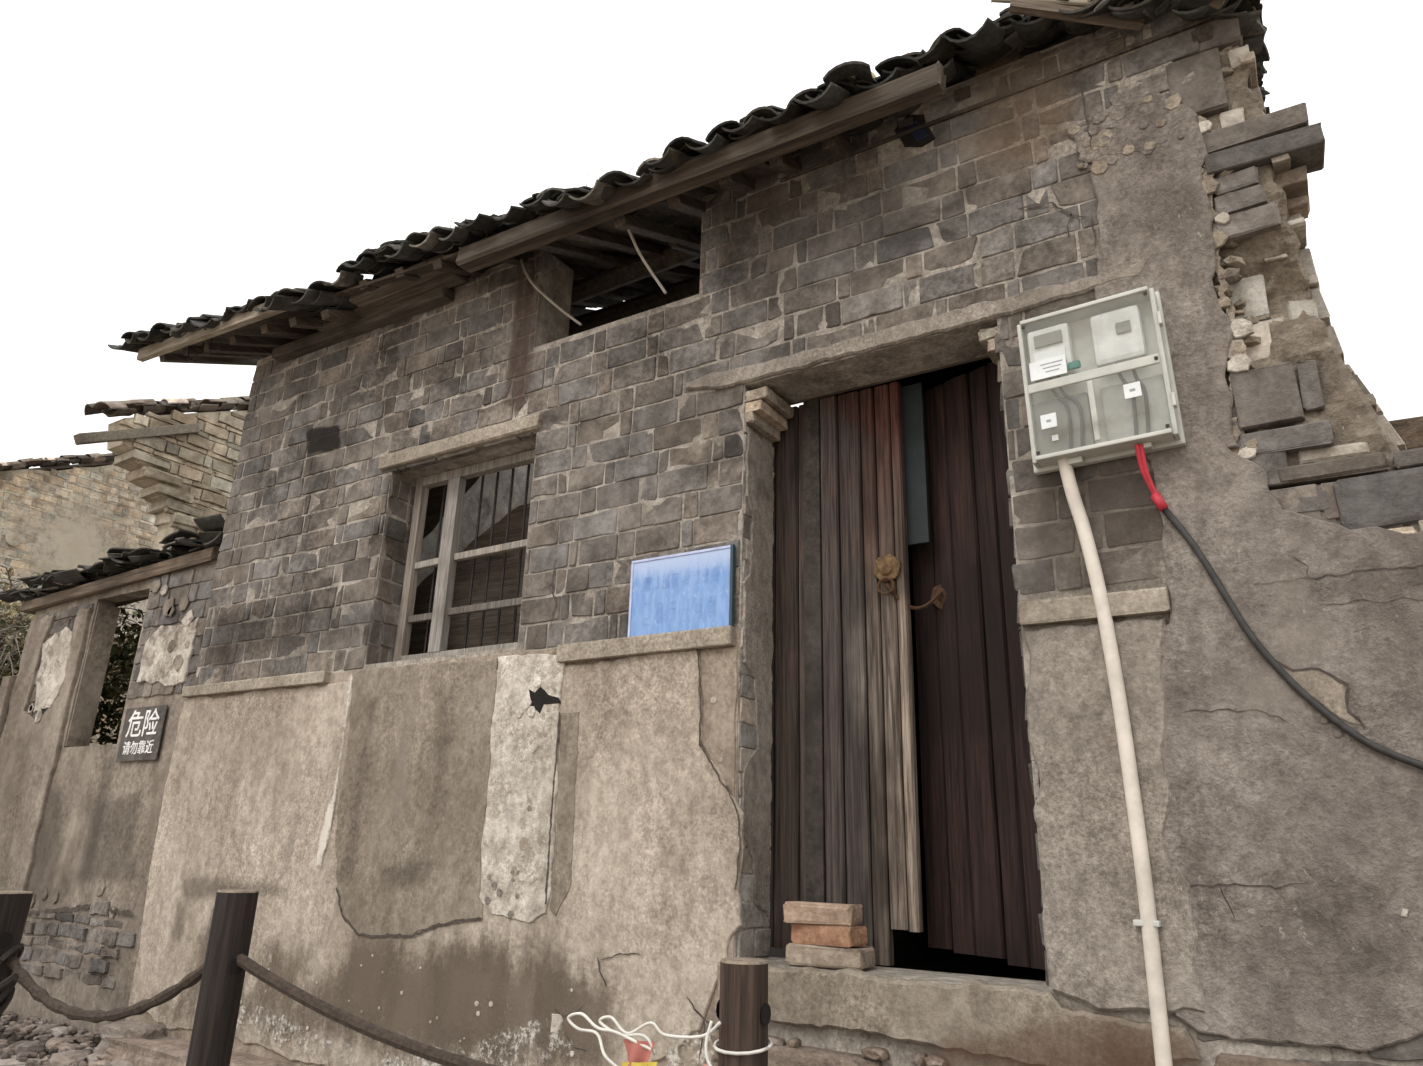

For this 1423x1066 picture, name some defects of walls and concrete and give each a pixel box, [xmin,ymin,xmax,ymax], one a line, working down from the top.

spalling [1068,17,1423,533]
flaking render [27,603,94,723]
flaking render [127,564,217,699]
crack [1263,555,1423,606]
flaking render [335,654,579,938]
flaking render [20,878,136,989]
leakage [165,937,208,1015]
leakage [236,936,608,1066]